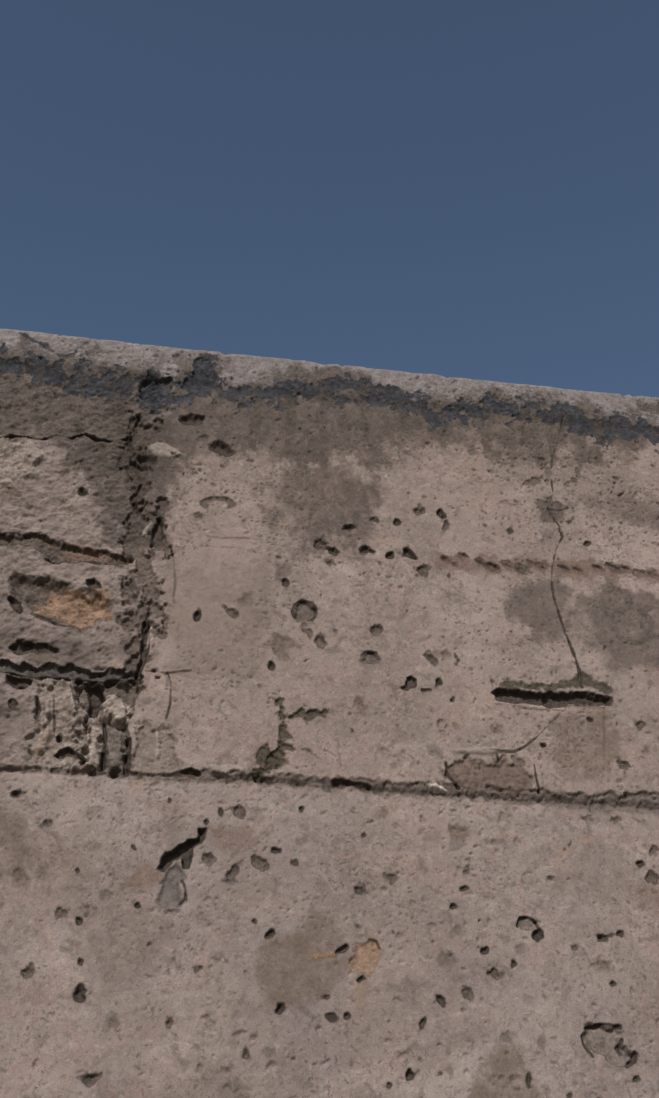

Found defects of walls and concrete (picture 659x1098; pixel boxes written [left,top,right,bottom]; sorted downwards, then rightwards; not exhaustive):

spalling [178,413,205,426]
damp [0,332,659,553]
crack [526,410,584,688]
spalling [0,412,180,779]
damp [505,580,659,669]
crack [0,658,191,719]
spalling [491,671,613,722]
spalling [181,767,202,777]
crack [488,714,560,794]
spalling [156,806,246,907]
spalling [223,847,298,883]
spalling [581,1023,641,1082]